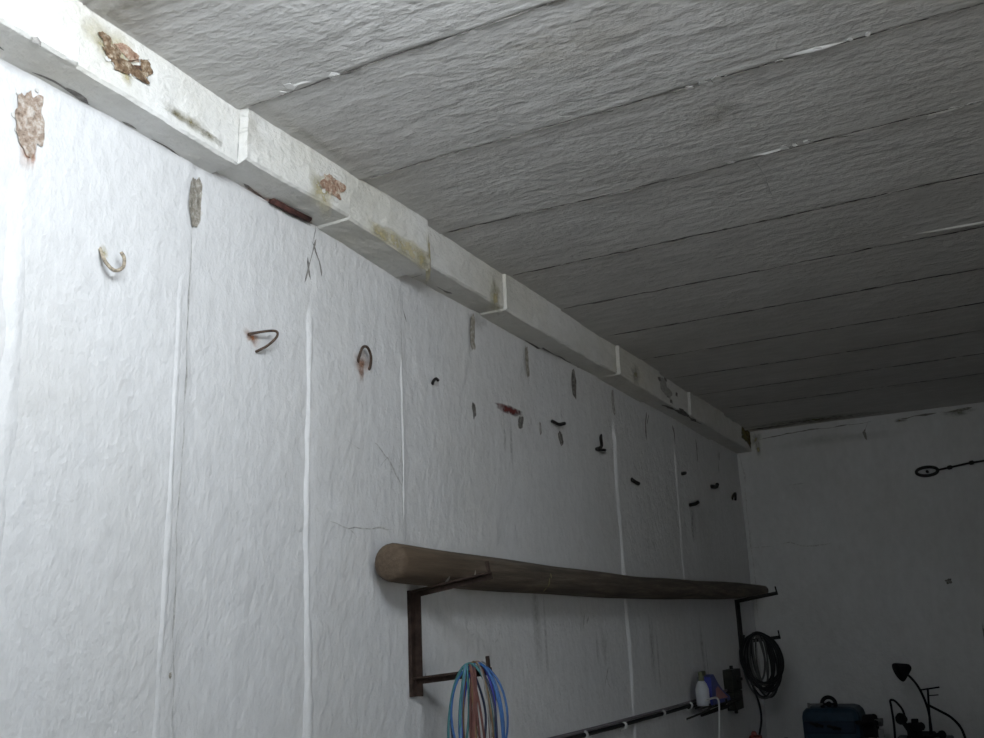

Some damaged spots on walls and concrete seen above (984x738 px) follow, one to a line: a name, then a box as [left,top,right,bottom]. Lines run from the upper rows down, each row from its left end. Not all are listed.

corrosion [497,404,520,415]